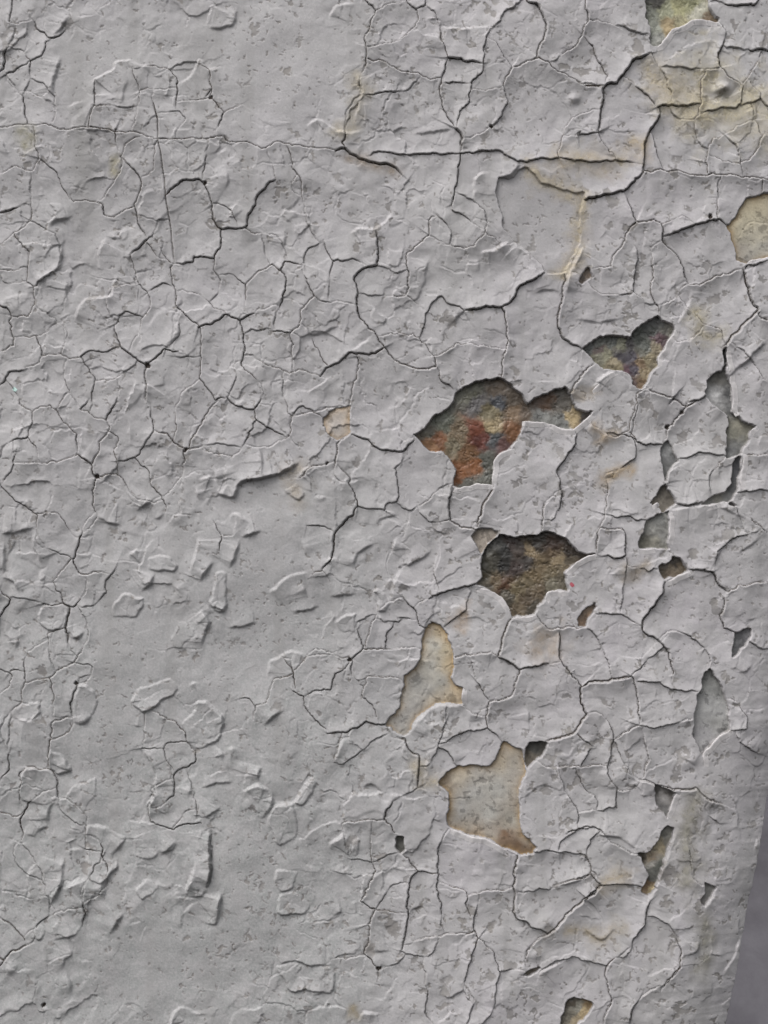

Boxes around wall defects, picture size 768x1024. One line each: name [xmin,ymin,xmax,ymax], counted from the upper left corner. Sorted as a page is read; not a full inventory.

peeling [645,0,718,52]
crack [0,0,768,512]
peeling [583,317,679,395]
crack [299,434,493,573]
peeling [415,379,596,493]
crack [596,388,725,571]
peeling [476,532,600,623]
crack [0,486,113,841]
peeling [386,622,467,735]
crack [144,712,197,830]
crack [248,584,699,1015]
peeling [439,742,536,856]